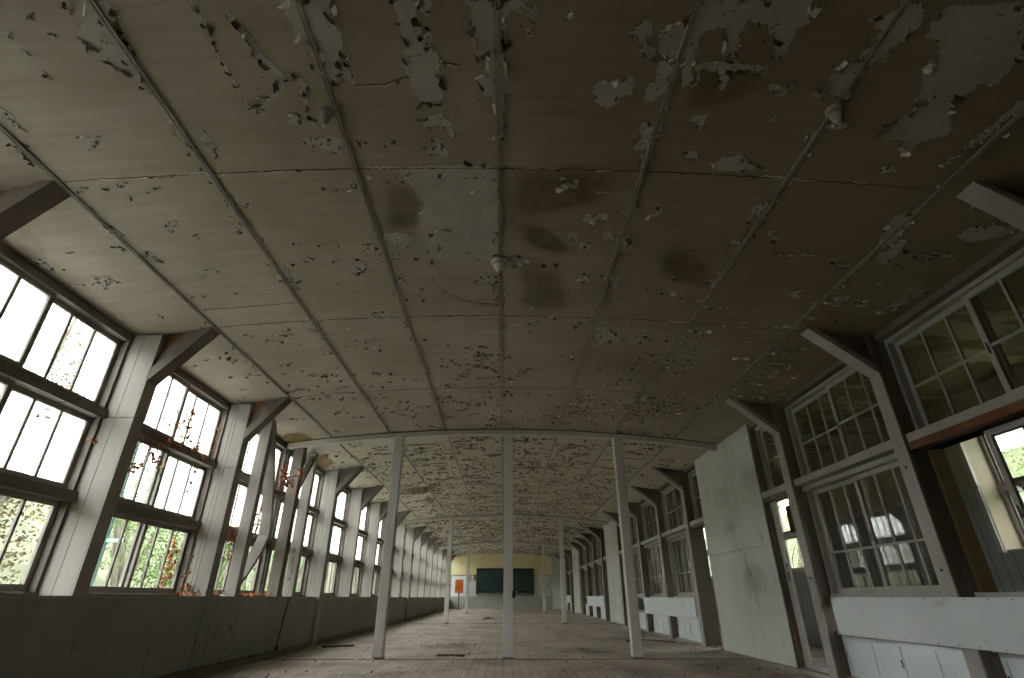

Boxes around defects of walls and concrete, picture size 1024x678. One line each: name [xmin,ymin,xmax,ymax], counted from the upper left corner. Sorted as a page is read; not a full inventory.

peeling [57,0,264,243]
peeling [225,0,368,155]
peeling [267,0,508,304]
peeling [593,0,822,110]
peeling [819,0,1024,174]
crack [203,260,782,331]
peeling [278,286,688,556]